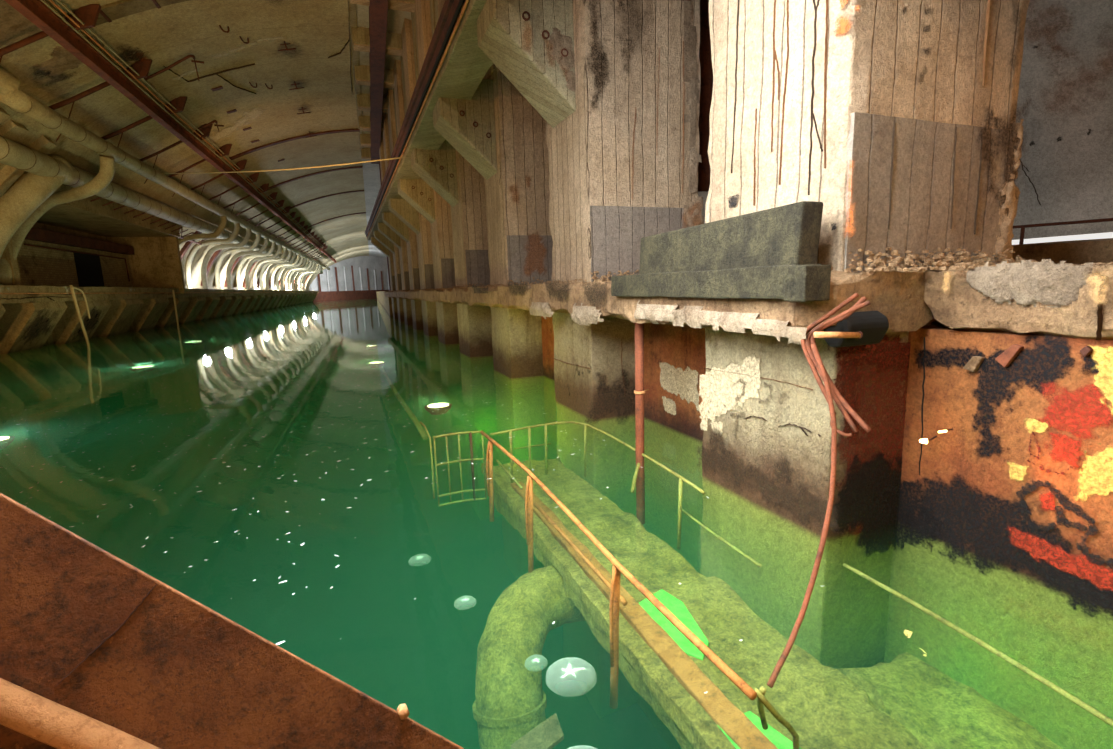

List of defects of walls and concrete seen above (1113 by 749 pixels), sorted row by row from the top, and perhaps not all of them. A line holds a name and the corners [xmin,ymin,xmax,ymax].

water stain [586,0,608,108]
spalling [966,119,1093,308]
peeling [660,356,761,435]